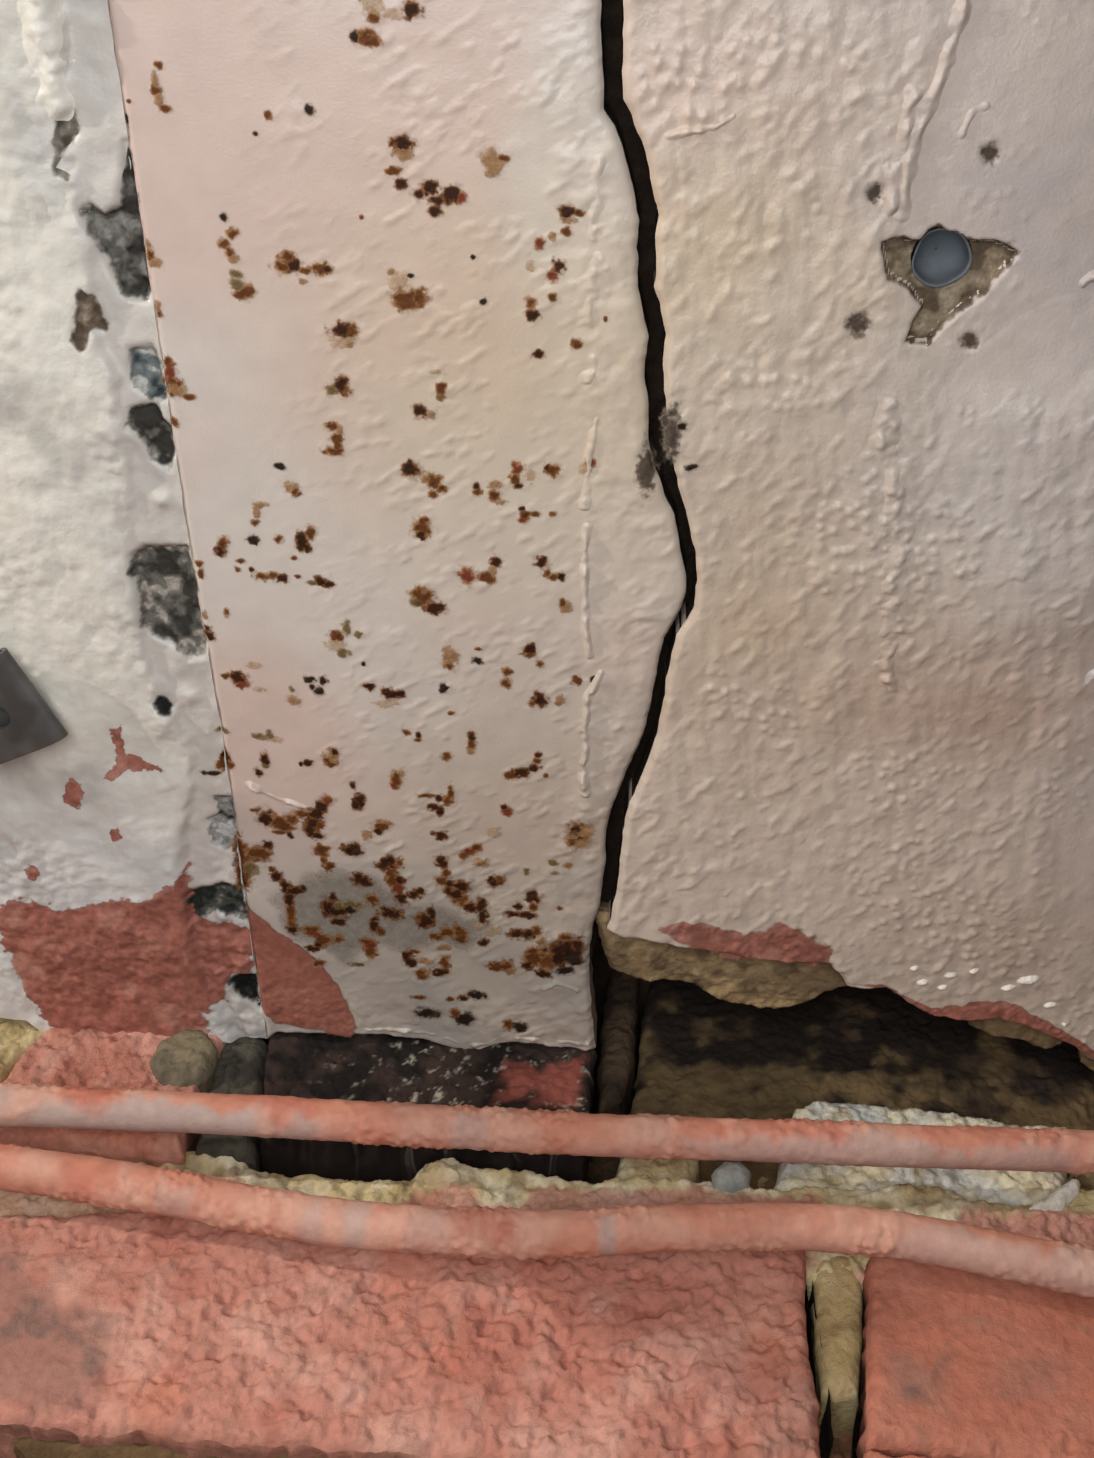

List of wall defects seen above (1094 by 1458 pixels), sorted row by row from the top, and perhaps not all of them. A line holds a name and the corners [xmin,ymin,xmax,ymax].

corrosion [349,0,424,48]
spalling [70,289,108,351]
spalling [83,147,151,298]
corrosion [384,134,467,217]
corrosion [525,205,585,322]
spalling [866,0,1018,346]
spalling [128,346,174,464]
crack [589,0,698,971]
spalling [127,545,207,656]
corrosion [194,501,335,588]
corrosion [232,781,585,1026]
spalling [595,901,847,1009]